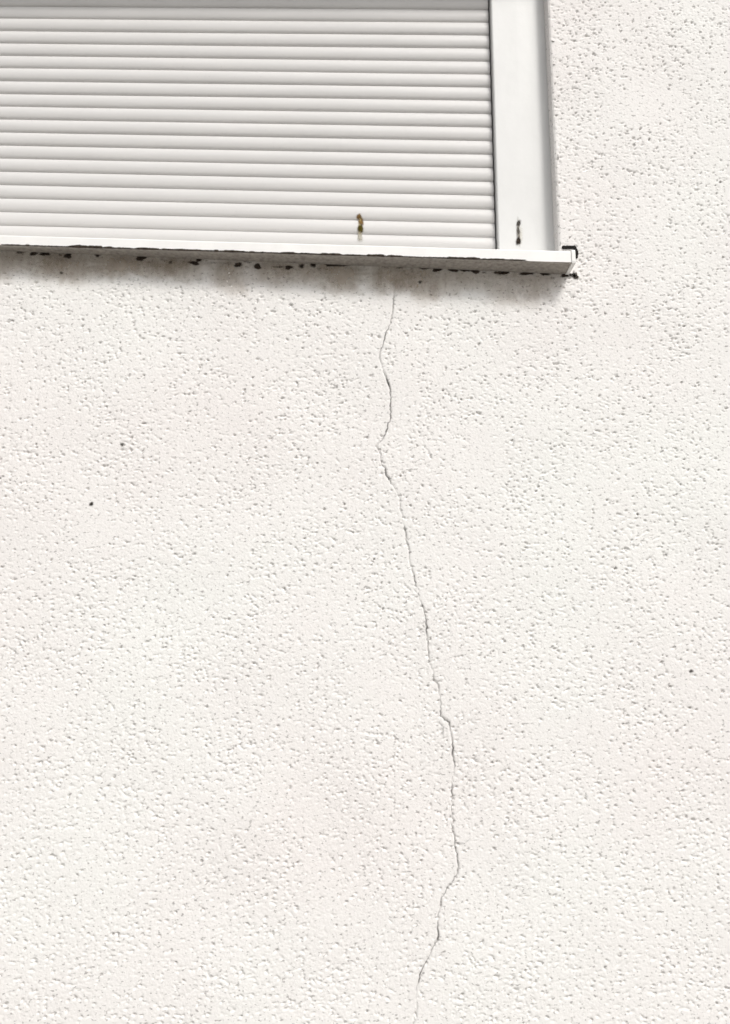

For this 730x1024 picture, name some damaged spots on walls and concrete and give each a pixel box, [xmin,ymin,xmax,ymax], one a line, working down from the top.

leakage [1,244,579,286]